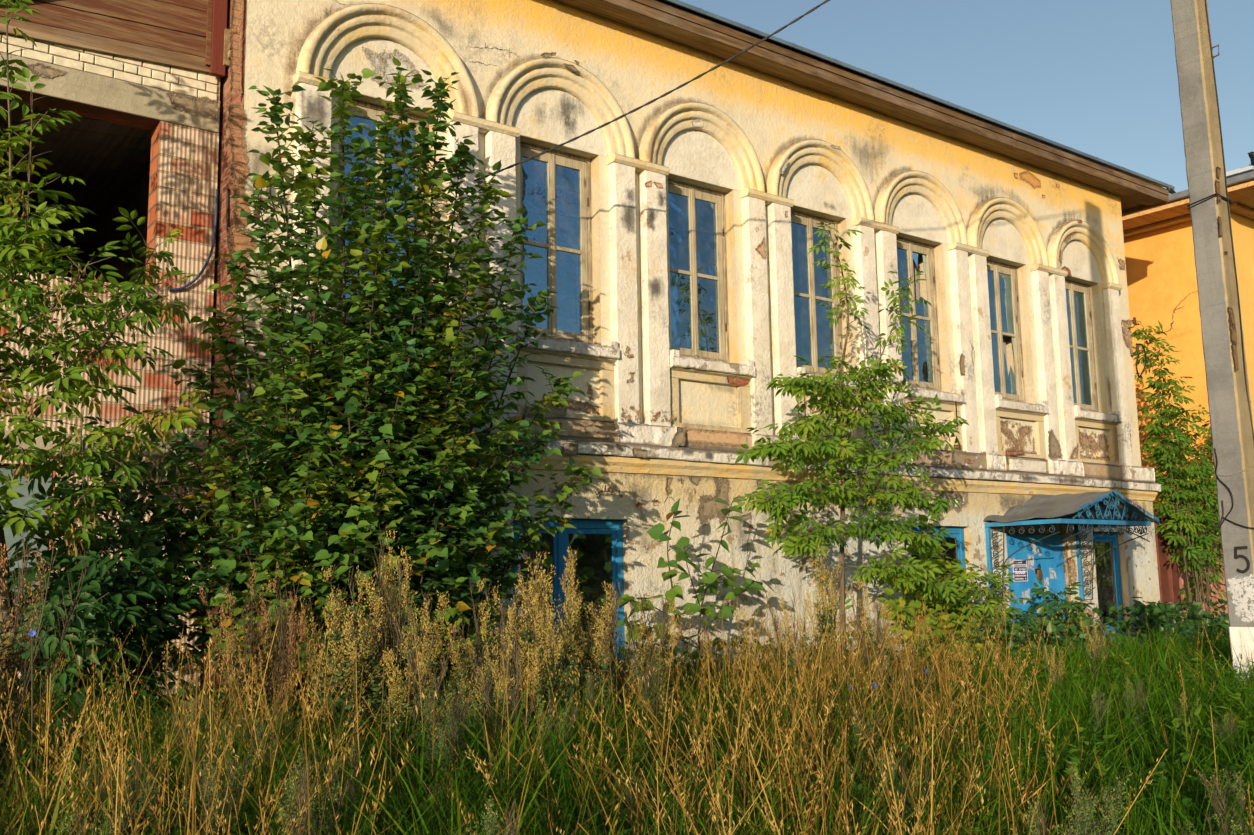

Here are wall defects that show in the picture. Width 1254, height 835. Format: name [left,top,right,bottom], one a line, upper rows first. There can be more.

peeling [635,476,753,531]